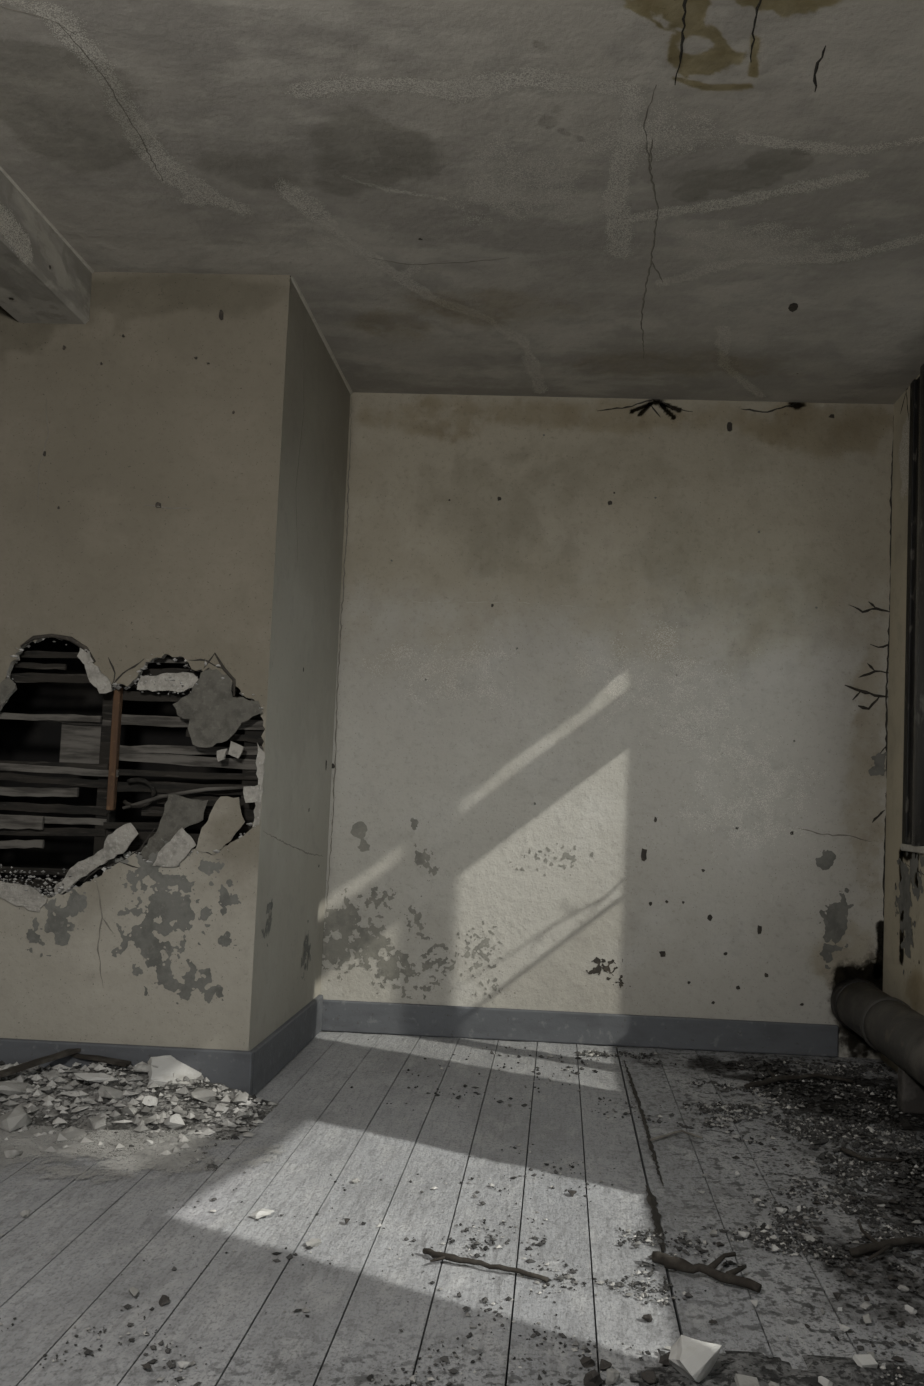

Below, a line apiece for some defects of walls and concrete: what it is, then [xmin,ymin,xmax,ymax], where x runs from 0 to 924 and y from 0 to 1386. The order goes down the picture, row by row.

crack [750,0,762,61]
crack [813,45,826,92]
crack [640,0,687,358]
crack [598,399,693,418]
crack [742,402,800,413]
crack [799,388,924,942]
spalling [0,634,266,1004]
peeling [301,818,516,1000]
peeling [819,888,854,969]
peeling [895,844,924,975]